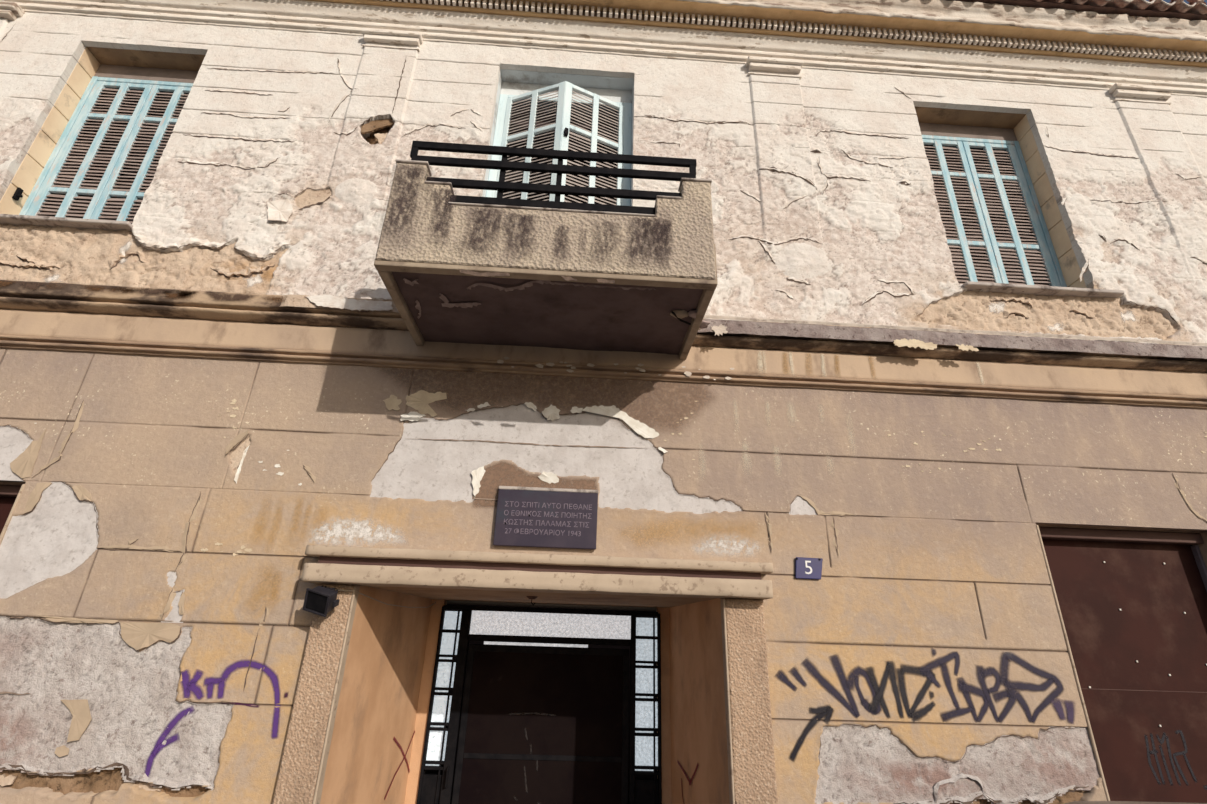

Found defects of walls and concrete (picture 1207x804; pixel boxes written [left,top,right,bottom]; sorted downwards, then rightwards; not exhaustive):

flaking render [0,223,399,312]
leakage [384,167,419,232]
leakage [433,189,451,233]
leakage [464,209,533,250]
leakage [630,218,670,260]
crack [729,235,821,299]
crack [740,129,909,209]
crack [862,279,914,305]
flaking render [670,291,1207,359]
flaking render [370,390,742,514]
flaking render [0,423,99,599]
flaking render [0,571,234,797]